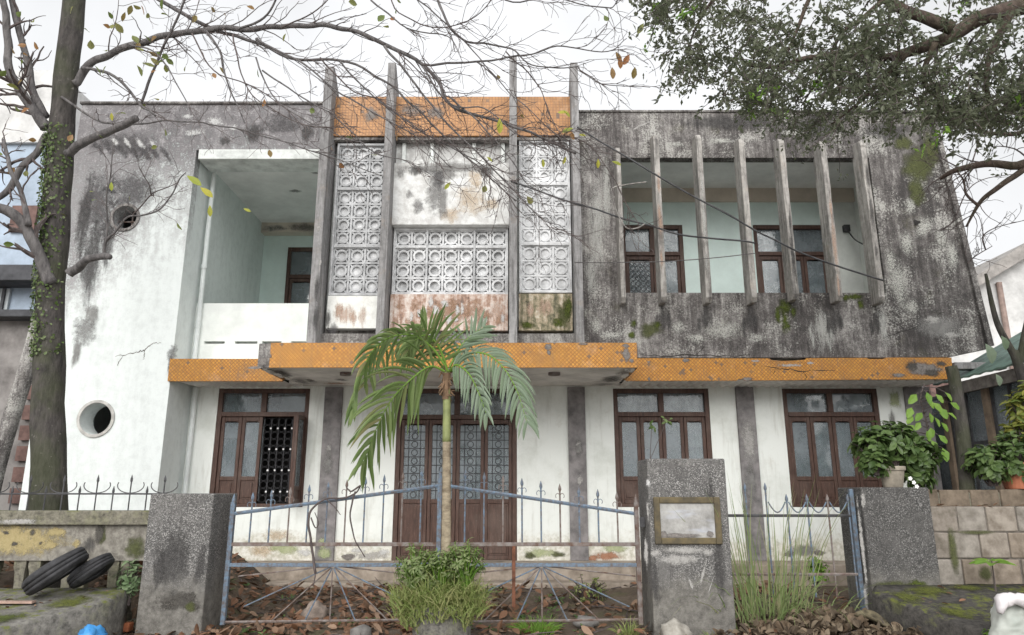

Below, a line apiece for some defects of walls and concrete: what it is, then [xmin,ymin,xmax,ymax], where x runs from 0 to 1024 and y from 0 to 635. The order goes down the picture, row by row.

leakage [247,115,311,141]
leakage [93,134,171,162]
leakage [398,162,493,213]
leakage [909,181,925,205]
leakage [77,175,153,292]
rust [336,306,365,321]
leakage [72,307,98,364]
peeling [601,344,634,385]
peeling [893,361,945,377]